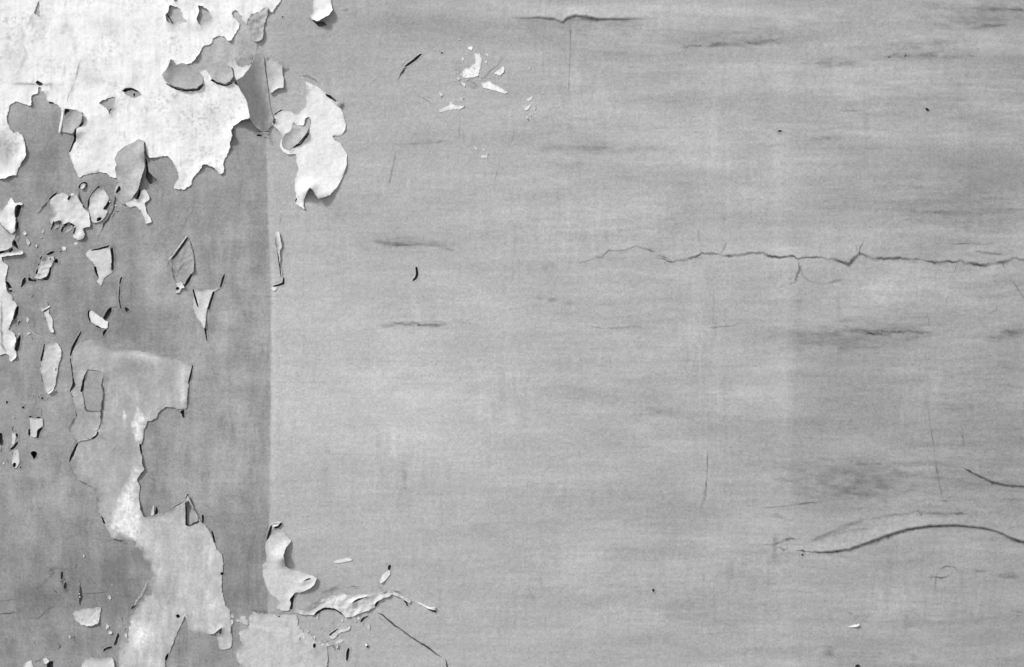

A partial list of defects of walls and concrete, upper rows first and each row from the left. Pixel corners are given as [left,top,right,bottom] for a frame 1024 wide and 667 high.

peeling [0,0,438,667]
crack [767,255,855,273]